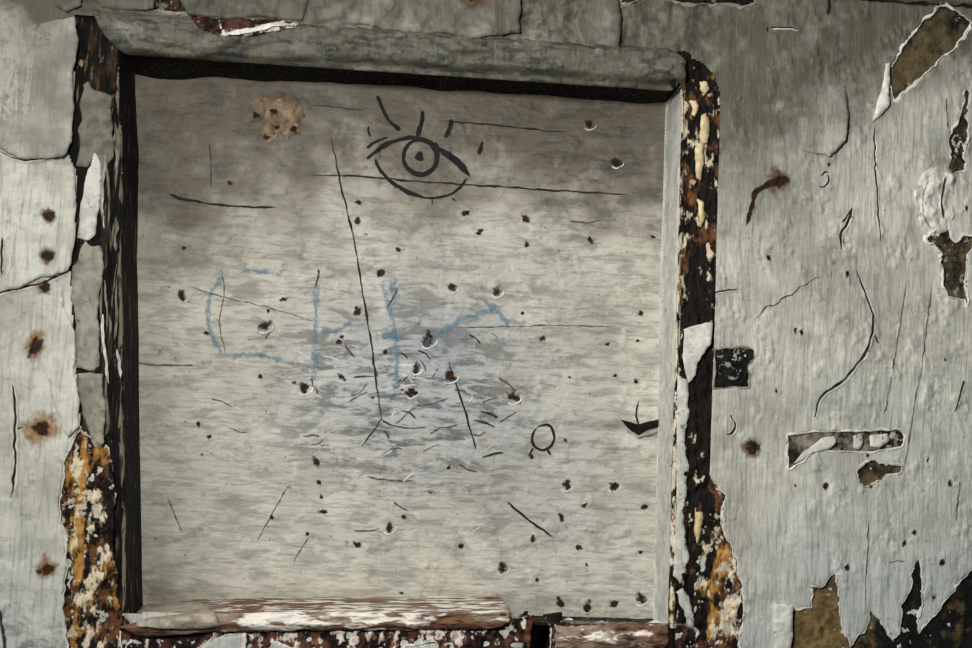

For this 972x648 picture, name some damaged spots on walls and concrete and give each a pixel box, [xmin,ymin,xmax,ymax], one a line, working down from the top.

peeling [872,3,972,122]
rust [746,170,789,225]
peeling [914,86,972,309]
rust [24,415,58,441]
peeling [672,322,755,621]
peeling [785,427,907,487]
rust [36,430,534,648]
rust [549,618,598,648]
rust [612,471,747,648]
peeling [773,556,972,648]